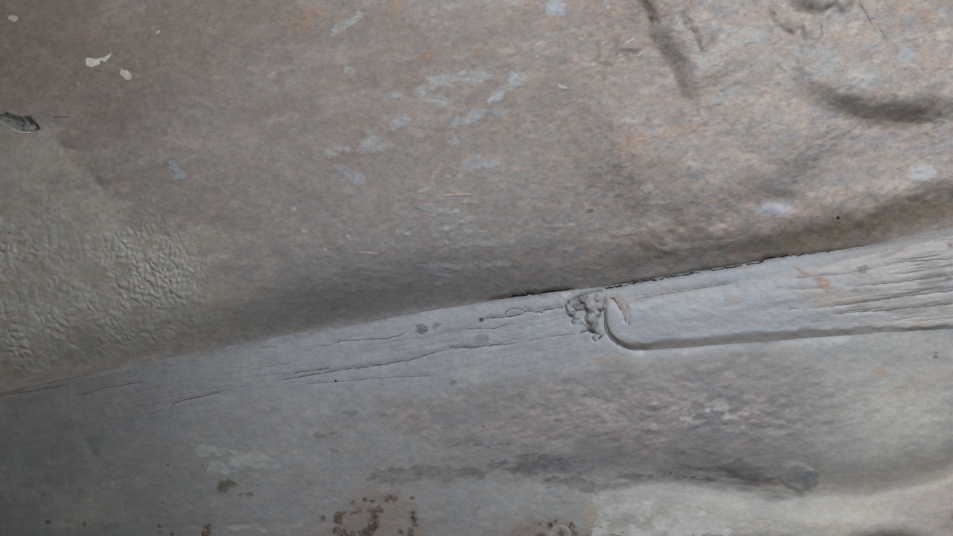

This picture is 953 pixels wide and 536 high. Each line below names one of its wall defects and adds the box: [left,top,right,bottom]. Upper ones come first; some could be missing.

spalling [0,110,42,135]
crack [275,238,953,385]
crack [0,381,144,397]
crack [168,392,222,412]
damp [365,434,813,532]
rust [319,484,431,536]
rust [496,514,592,536]